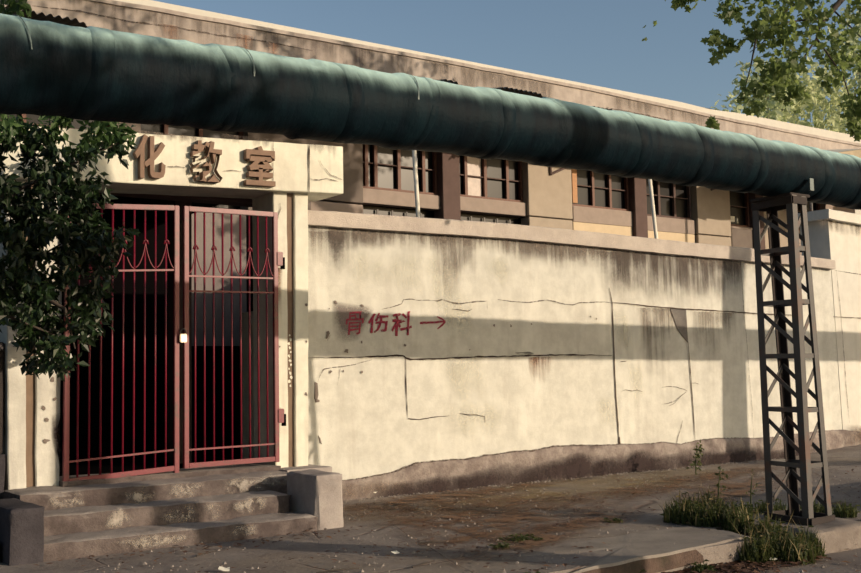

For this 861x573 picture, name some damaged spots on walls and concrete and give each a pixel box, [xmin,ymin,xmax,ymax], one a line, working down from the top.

leakage [311,226,394,248]
leakage [433,235,471,266]
leakage [498,239,741,282]
crack [384,298,791,316]
leakage [643,308,672,344]
leakage [699,312,732,328]
crack [313,343,763,481]
leakage [366,449,784,497]